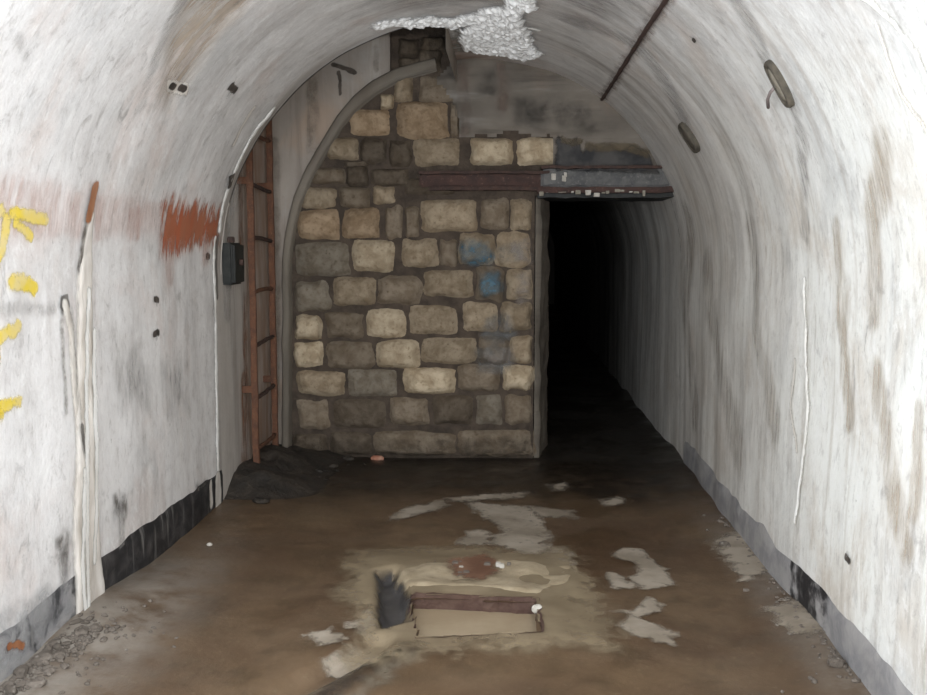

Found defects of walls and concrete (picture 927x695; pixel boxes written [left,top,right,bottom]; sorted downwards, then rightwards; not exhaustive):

crack [789,277,809,524]